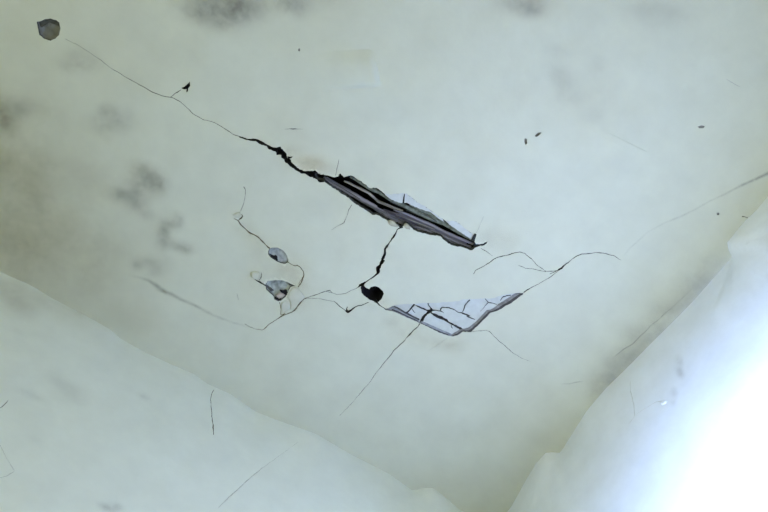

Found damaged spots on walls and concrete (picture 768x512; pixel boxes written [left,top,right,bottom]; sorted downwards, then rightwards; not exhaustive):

spalling [37,19,60,41]
crack [66,39,339,182]
crack [235,187,270,249]
spalling [268,248,288,264]
spalling [265,280,295,301]
crack [247,224,403,330]
spalling [451,293,523,336]
crack [474,221,617,292]
crack [344,324,420,411]